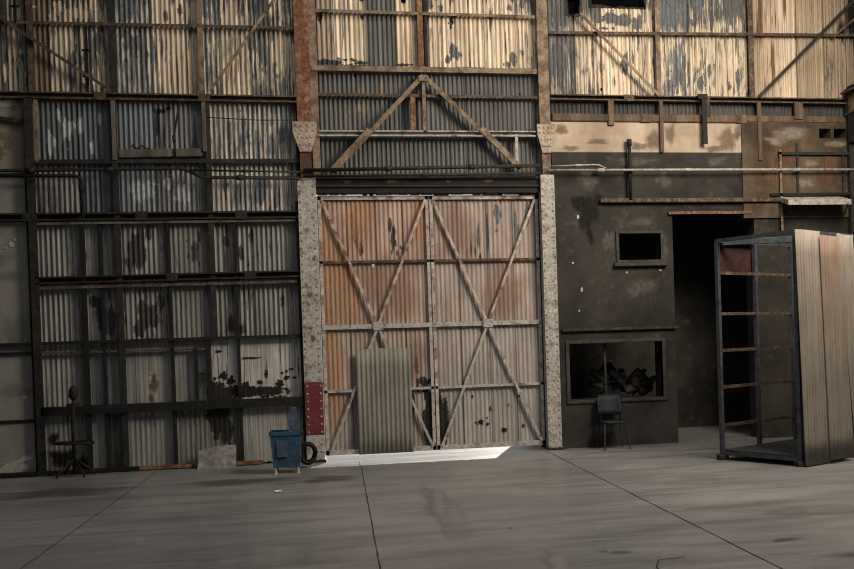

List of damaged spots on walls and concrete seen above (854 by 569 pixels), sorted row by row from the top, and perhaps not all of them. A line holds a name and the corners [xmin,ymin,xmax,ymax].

peeling [48,0,95,21]
peeling [426,0,455,29]
peeling [591,0,713,37]
peeling [1,6,27,82]
peeling [248,33,279,80]
peeling [445,43,462,64]
peeling [503,50,524,68]
peeling [620,49,634,75]
peeling [667,53,711,95]
peeling [46,108,84,159]
peeling [388,217,402,256]
peeling [89,293,165,339]